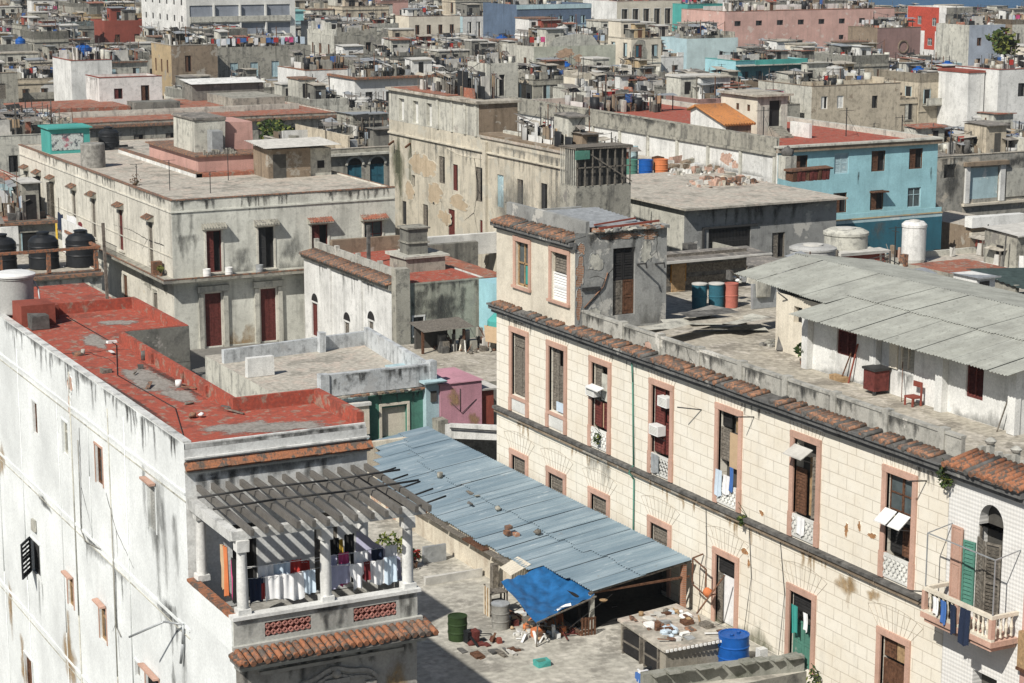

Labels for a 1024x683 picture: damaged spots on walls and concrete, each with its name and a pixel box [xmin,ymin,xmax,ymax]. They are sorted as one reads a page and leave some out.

peeling [405,151,470,226]
spalling [575,242,604,324]
leakage [838,578,855,594]